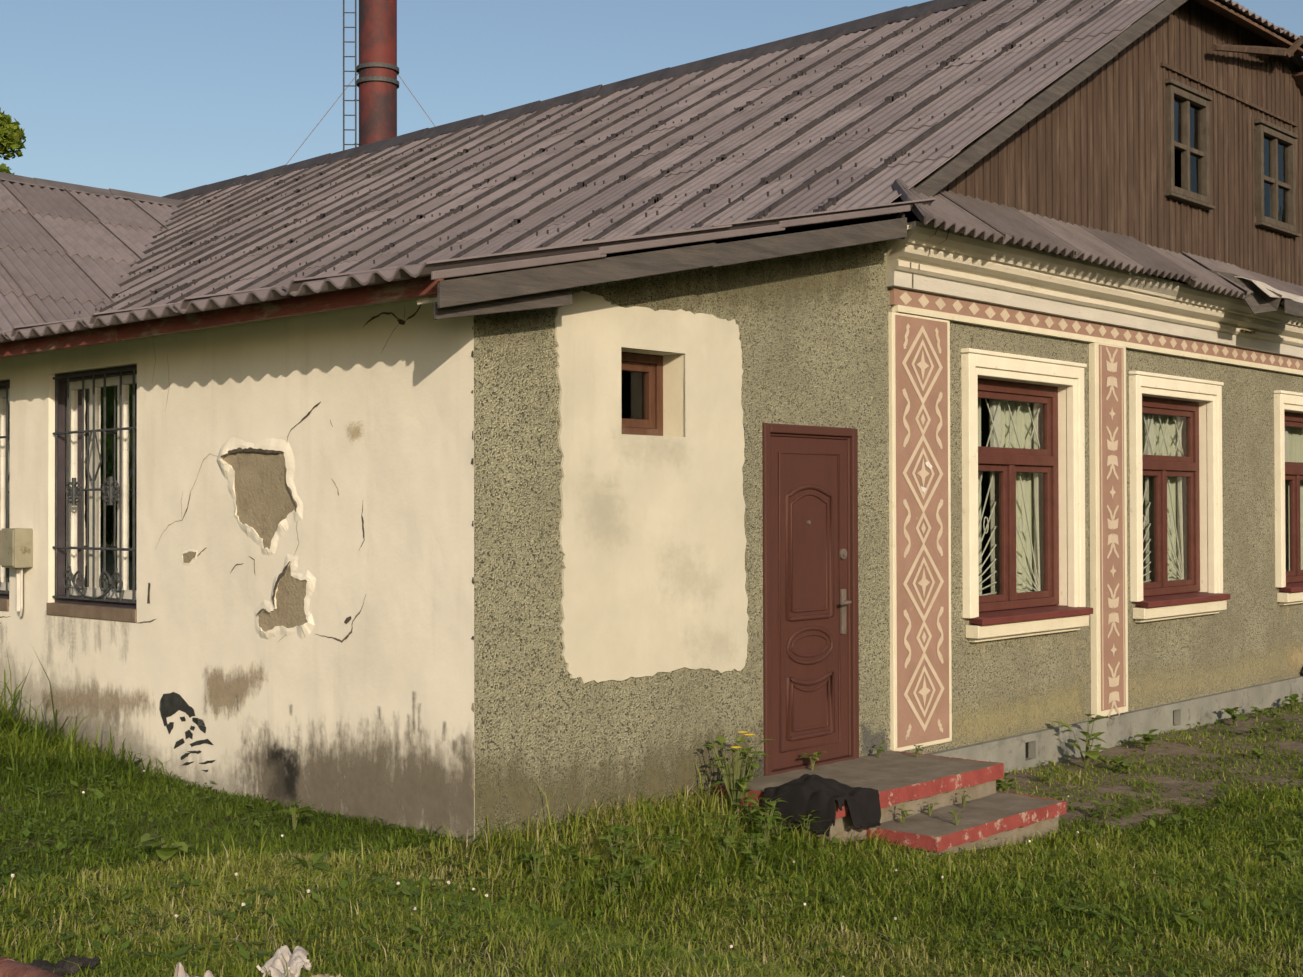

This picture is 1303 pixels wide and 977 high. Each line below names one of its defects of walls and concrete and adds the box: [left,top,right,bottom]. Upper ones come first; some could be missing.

crack [362,304,421,353]
crack [287,402,333,439]
crack [155,454,218,549]
flaking render [216,437,316,640]
crack [317,595,366,643]
leakage [249,722,764,843]